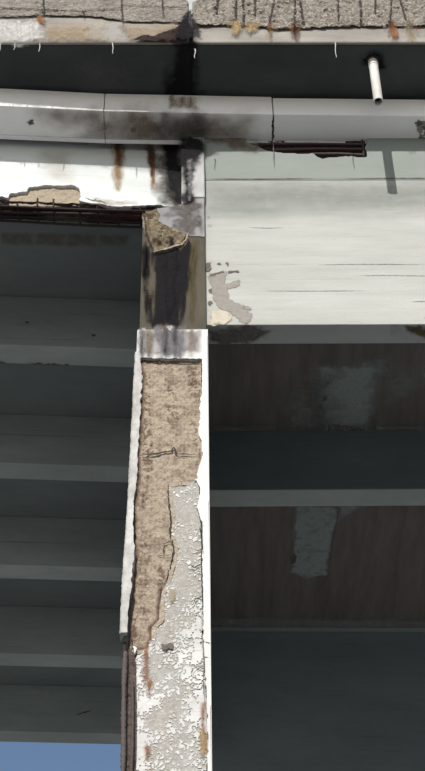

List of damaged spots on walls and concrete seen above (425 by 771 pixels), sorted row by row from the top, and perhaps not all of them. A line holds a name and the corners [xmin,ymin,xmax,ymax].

leakage [0,20,107,41]
corrosion [113,143,124,189]
corrosion [146,144,155,187]
leakage [98,11,268,358]
spalling [250,140,367,159]
peeling [415,120,425,139]
spalling [0,188,189,254]
peeling [205,262,252,323]
spalling [120,357,208,771]